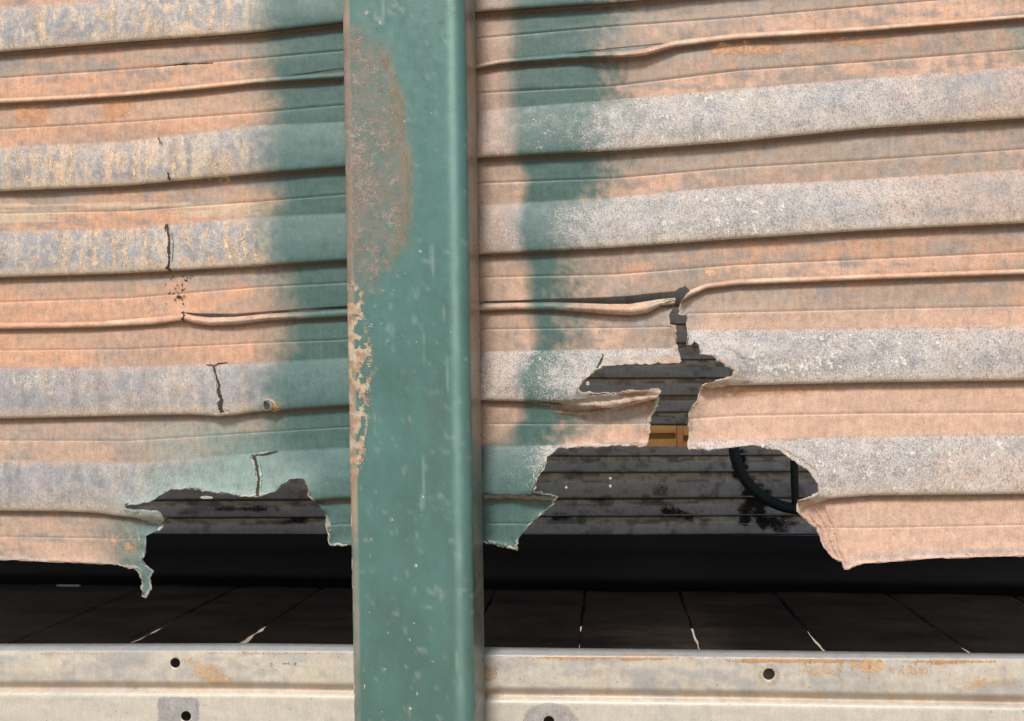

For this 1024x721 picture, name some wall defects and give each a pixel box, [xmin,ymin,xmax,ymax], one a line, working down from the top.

rust [343,23,411,300]
crack [164,224,173,272]
peeling [748,333,1015,379]
crack [206,362,229,416]
peeling [347,277,395,491]
crack [251,451,277,496]
peeling [794,441,1012,492]